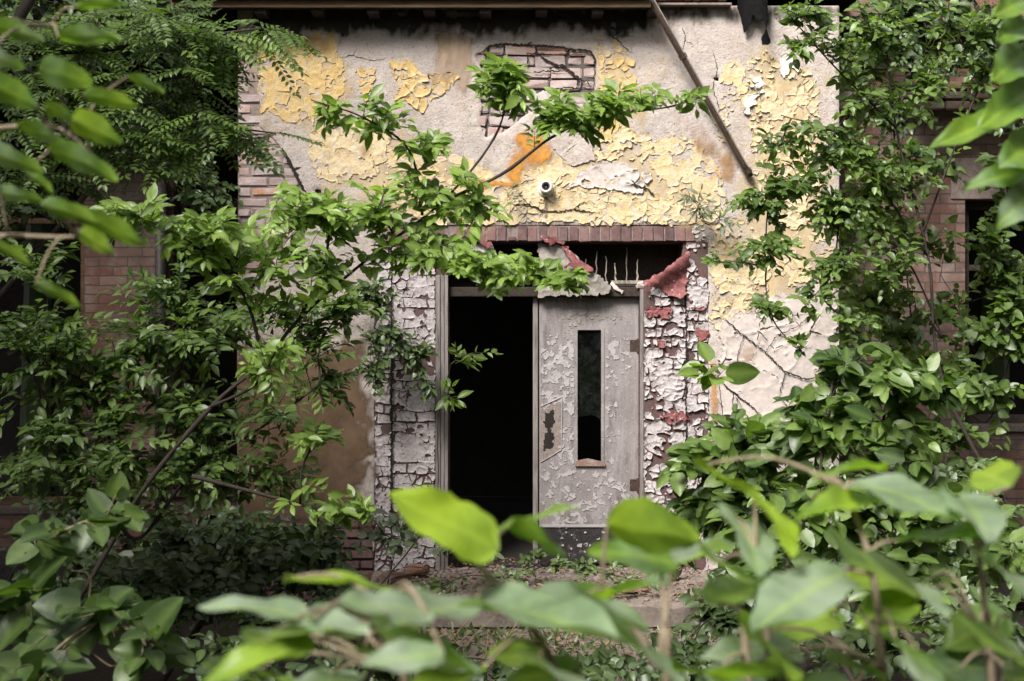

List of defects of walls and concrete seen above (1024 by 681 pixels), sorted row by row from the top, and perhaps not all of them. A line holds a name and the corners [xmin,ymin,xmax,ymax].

peeling [374,243,436,572]
rust [470,132,552,188]
peeling [238,30,835,512]
peeling [541,308,631,563]
crack [723,383,760,414]
crack [722,316,815,407]